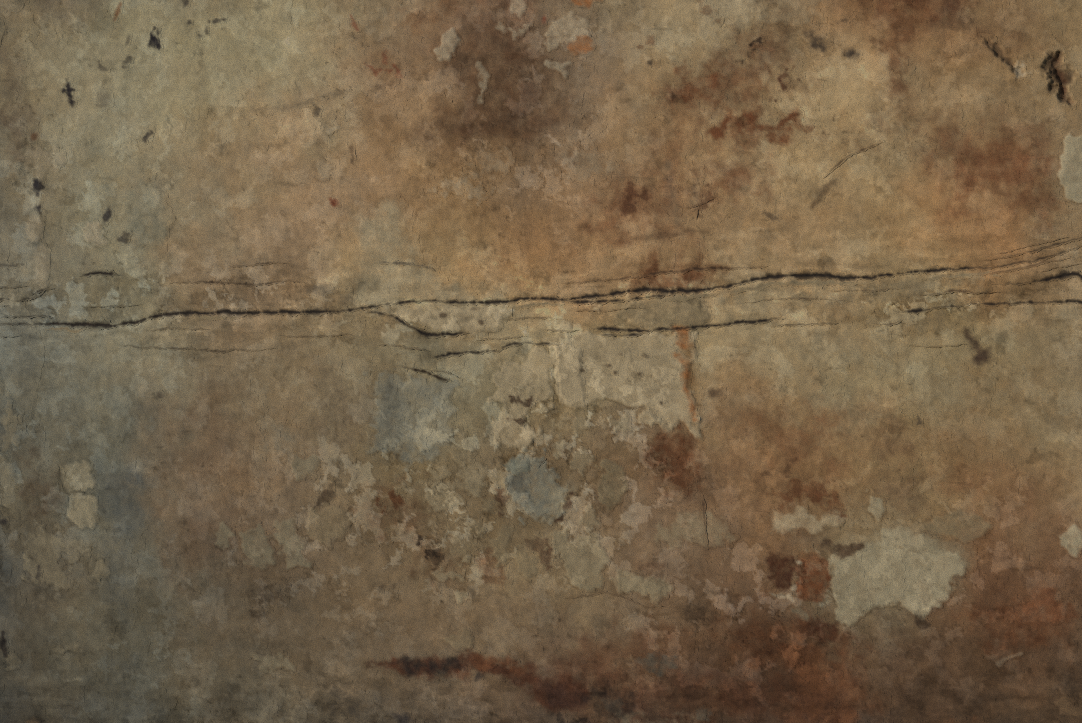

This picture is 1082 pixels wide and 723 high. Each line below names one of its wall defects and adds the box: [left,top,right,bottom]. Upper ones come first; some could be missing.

water stain [58,77,77,109]
water stain [146,24,163,52]
rust [309,0,1081,331]
crack [0,236,1082,383]
water stain [0,248,69,660]
water stain [90,456,154,638]
water stain [250,352,436,530]
rust [348,468,513,594]
peeling [423,319,618,607]
peeling [606,506,740,609]
rust [633,320,951,723]
rust [361,647,531,697]